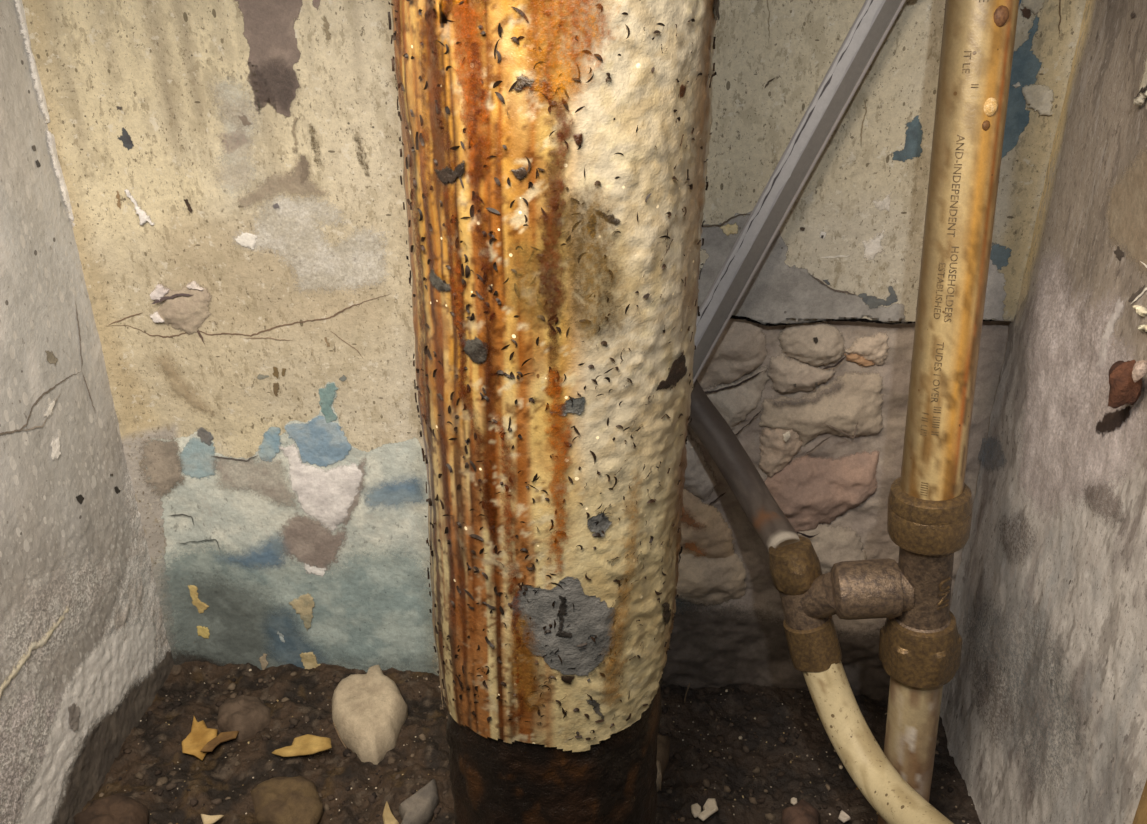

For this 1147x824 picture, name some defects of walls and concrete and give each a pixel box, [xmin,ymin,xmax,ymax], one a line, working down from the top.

crack [0,303,95,435]
crack [108,294,389,358]
peeling [102,375,437,675]
rust [394,0,432,427]
rust [419,0,501,400]
rust [444,192,539,728]
peeling [511,576,616,684]
rust [512,0,621,573]
spalling [662,424,785,626]
spalling [656,230,915,574]
peeling [892,115,923,162]
peeling [1001,0,1054,159]